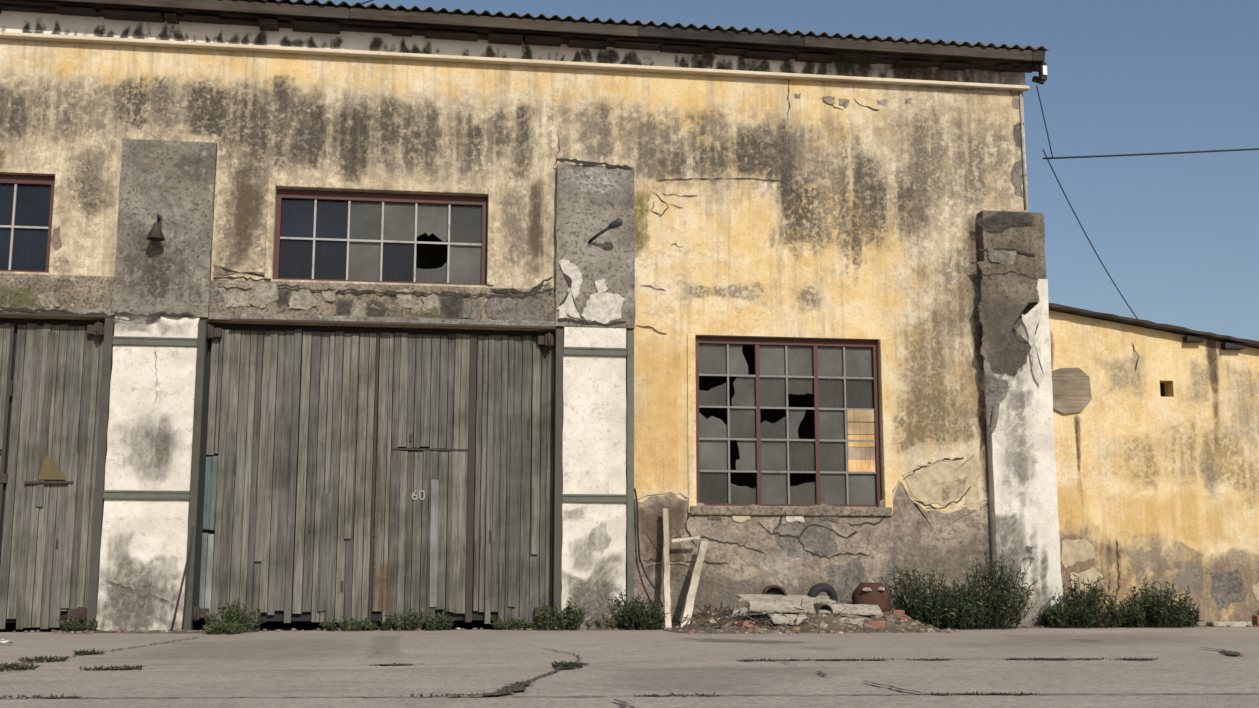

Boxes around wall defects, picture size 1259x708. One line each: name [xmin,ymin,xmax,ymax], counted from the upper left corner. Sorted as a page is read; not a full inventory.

leakage [370,38,438,54]
leakage [218,76,326,268]
leakage [496,106,543,269]
spalling [977,210,1035,232]
peeling [457,259,625,324]
leakage [895,223,989,488]
peeling [977,248,1045,486]
crack [644,512,886,569]
spalling [634,455,993,628]
crack [0,637,232,699]
crack [431,648,590,697]
crack [745,659,1035,695]